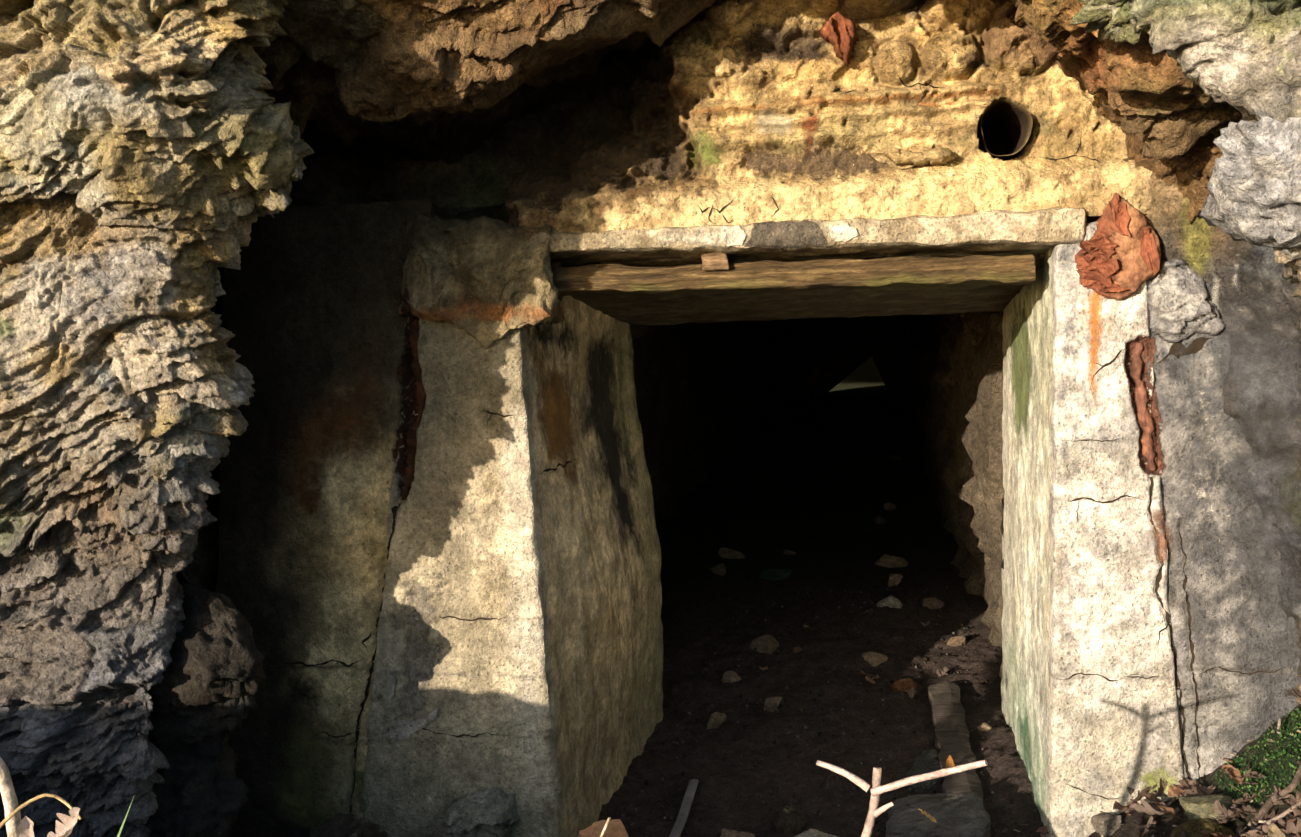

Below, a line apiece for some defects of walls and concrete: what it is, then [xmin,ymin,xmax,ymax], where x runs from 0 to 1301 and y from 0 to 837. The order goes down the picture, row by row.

rust [1076,193,1160,390]
water stain [528,321,642,554]
crack [273,503,400,813]
crack [439,614,504,622]
crack [1056,477,1287,780]